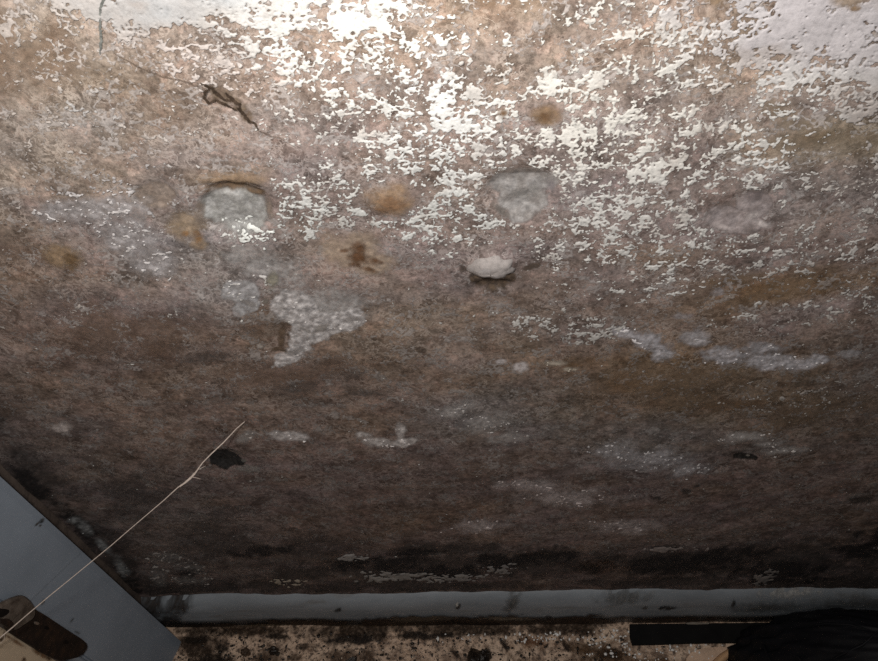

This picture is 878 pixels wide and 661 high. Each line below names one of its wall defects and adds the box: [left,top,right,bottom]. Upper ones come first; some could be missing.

crack [99,0,284,139]
damp [32,183,173,287]
peeling [0,0,878,463]
damp [222,246,367,394]
damp [497,359,527,372]
efflorescence [612,326,673,361]
efflorescence [682,332,829,371]
efflorescence [270,431,307,443]
efflorescence [357,423,417,448]
efflorescence [586,442,710,480]
damp [718,433,796,458]
damp [59,511,878,628]